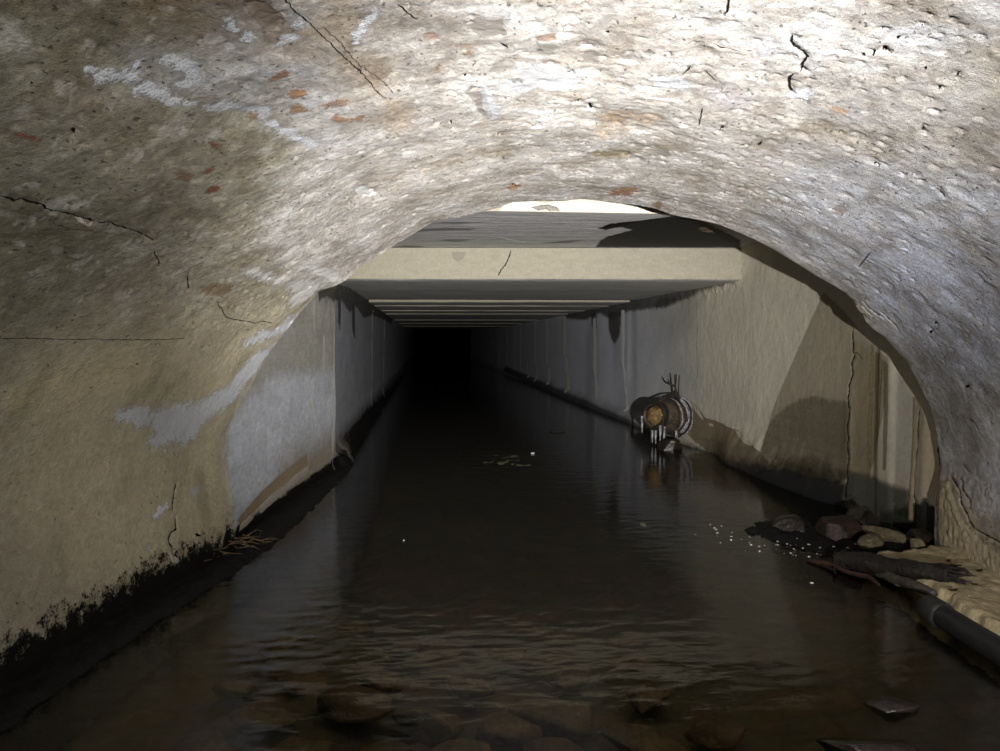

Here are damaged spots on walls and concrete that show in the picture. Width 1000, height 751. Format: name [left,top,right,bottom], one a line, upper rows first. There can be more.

damp [83,53,322,149]
corrosion [287,90,365,122]
crack [285,0,393,99]
crack [788,35,809,91]
crack [1,196,160,266]
crack [845,305,897,500]
damp [0,260,403,683]
crack [168,484,179,564]